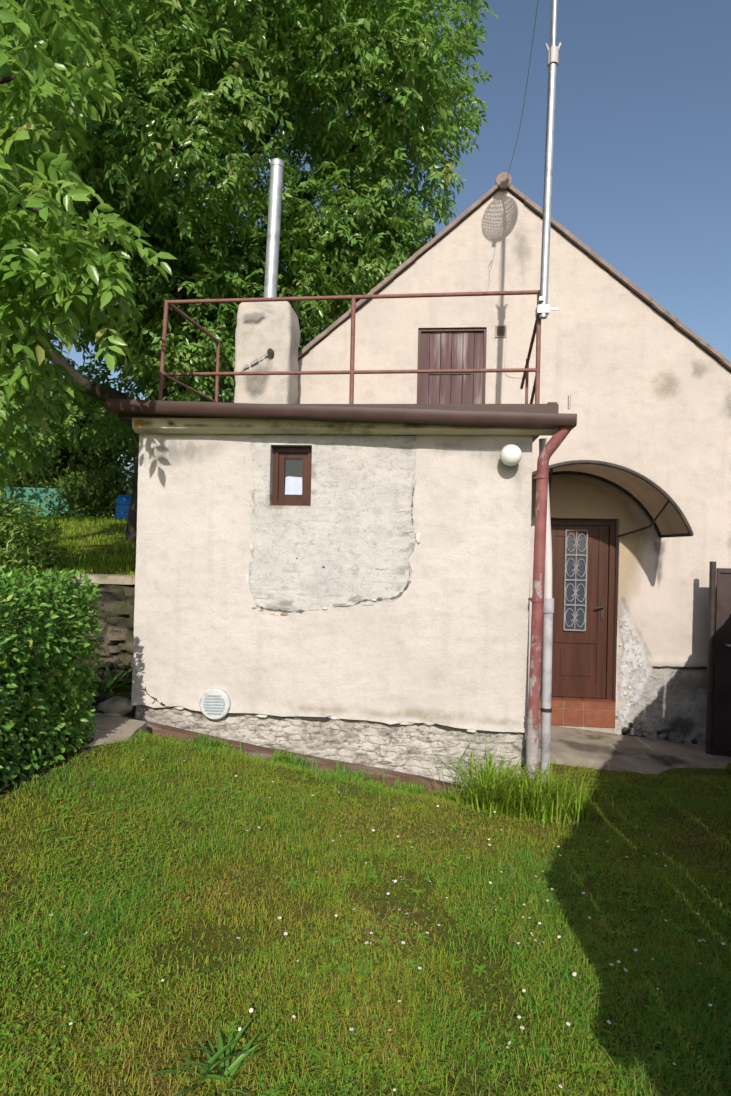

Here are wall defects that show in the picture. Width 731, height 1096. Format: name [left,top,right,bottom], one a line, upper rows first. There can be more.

peeling [246,435,420,616]
spalling [615,602,714,746]